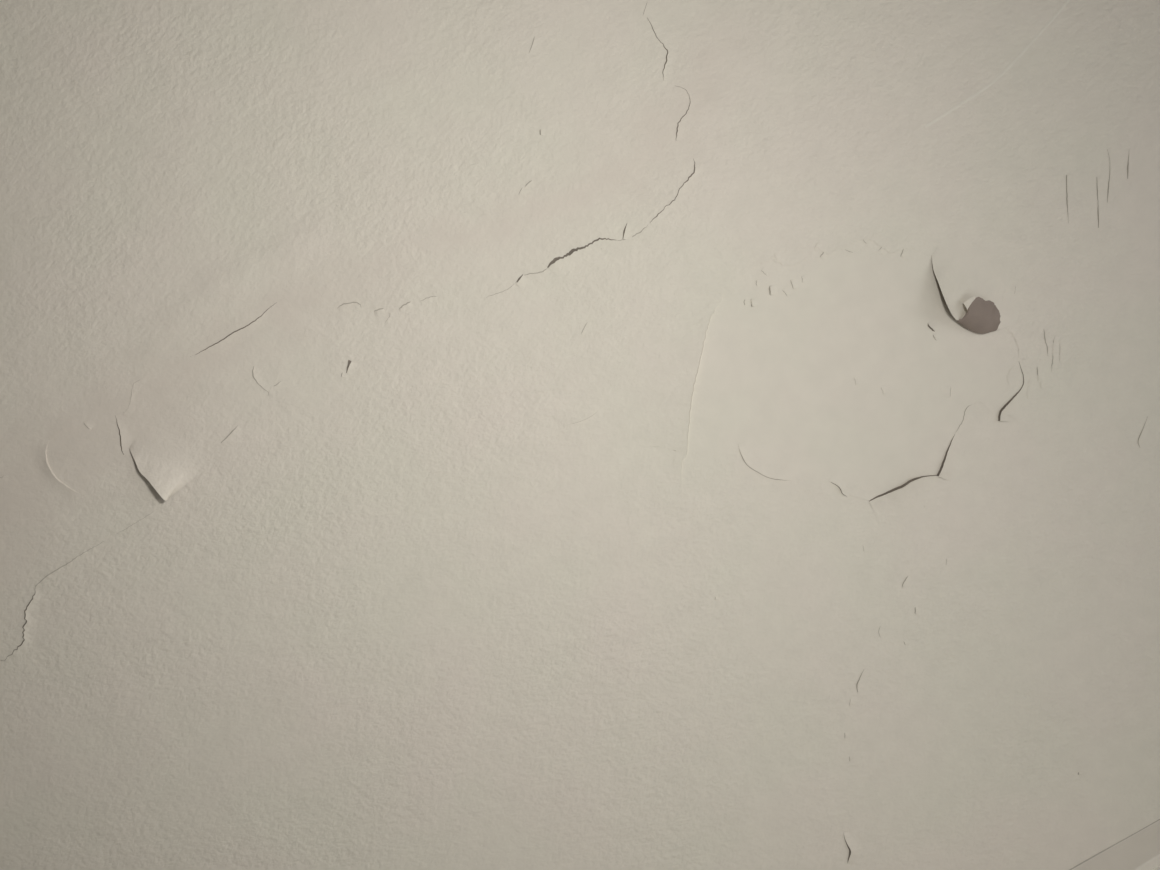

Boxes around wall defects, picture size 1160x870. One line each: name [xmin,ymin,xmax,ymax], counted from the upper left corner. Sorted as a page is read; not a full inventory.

crack [485,1,704,306]
peeling [115,302,284,501]